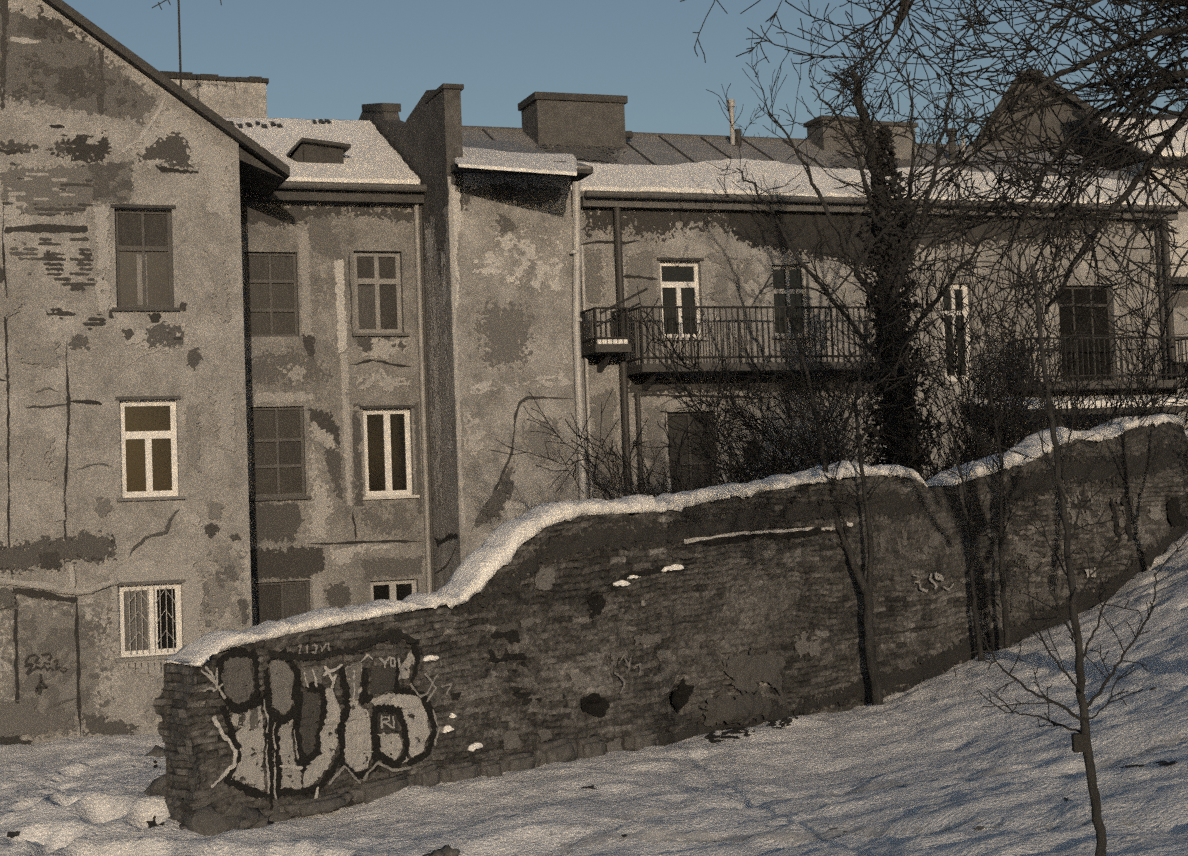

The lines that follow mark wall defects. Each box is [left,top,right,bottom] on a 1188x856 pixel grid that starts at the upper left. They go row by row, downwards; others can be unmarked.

flaking render [0,93,238,354]
flaking render [424,177,571,547]
crack [129,509,180,556]
spalling [588,594,606,619]
spalling [512,687,542,705]
spalling [563,671,610,718]
spalling [672,678,695,713]